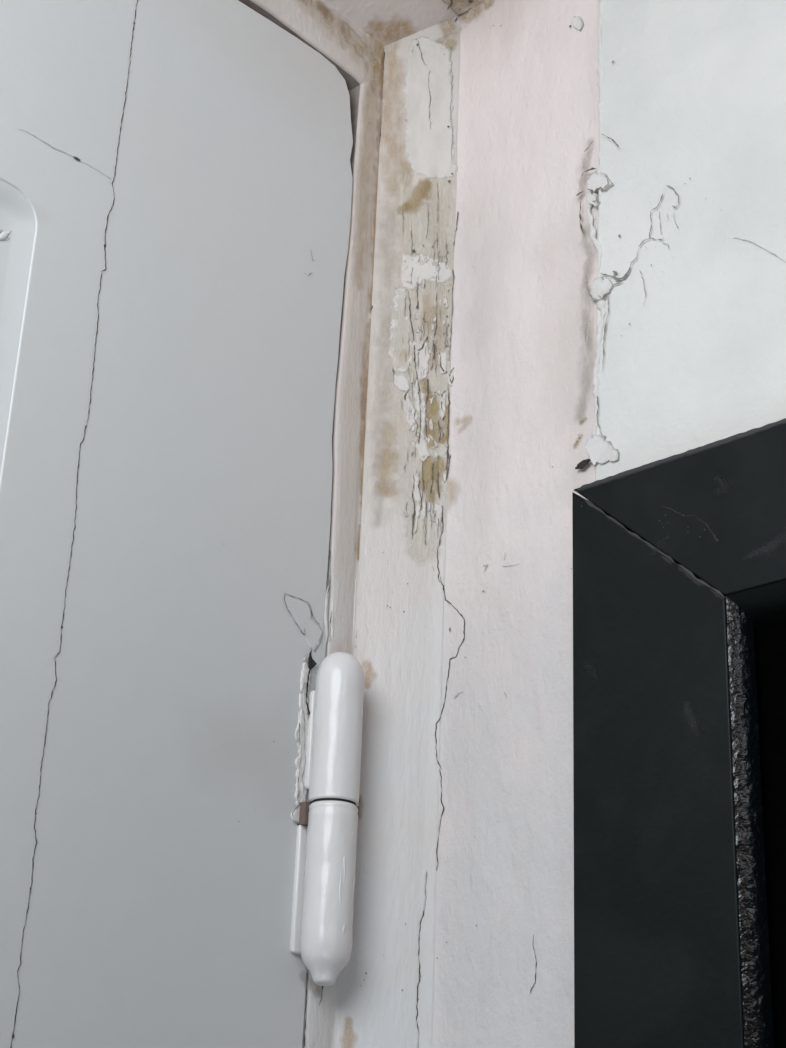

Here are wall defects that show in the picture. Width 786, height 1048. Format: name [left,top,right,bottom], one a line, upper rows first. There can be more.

water stain [442,0,492,48]
water stain [402,182,430,210]
peeling [387,36,459,560]
crack [601,178,706,302]
crack [9,0,138,1048]
water stain [422,380,450,501]
peeling [284,594,323,824]
crack [401,514,466,1044]